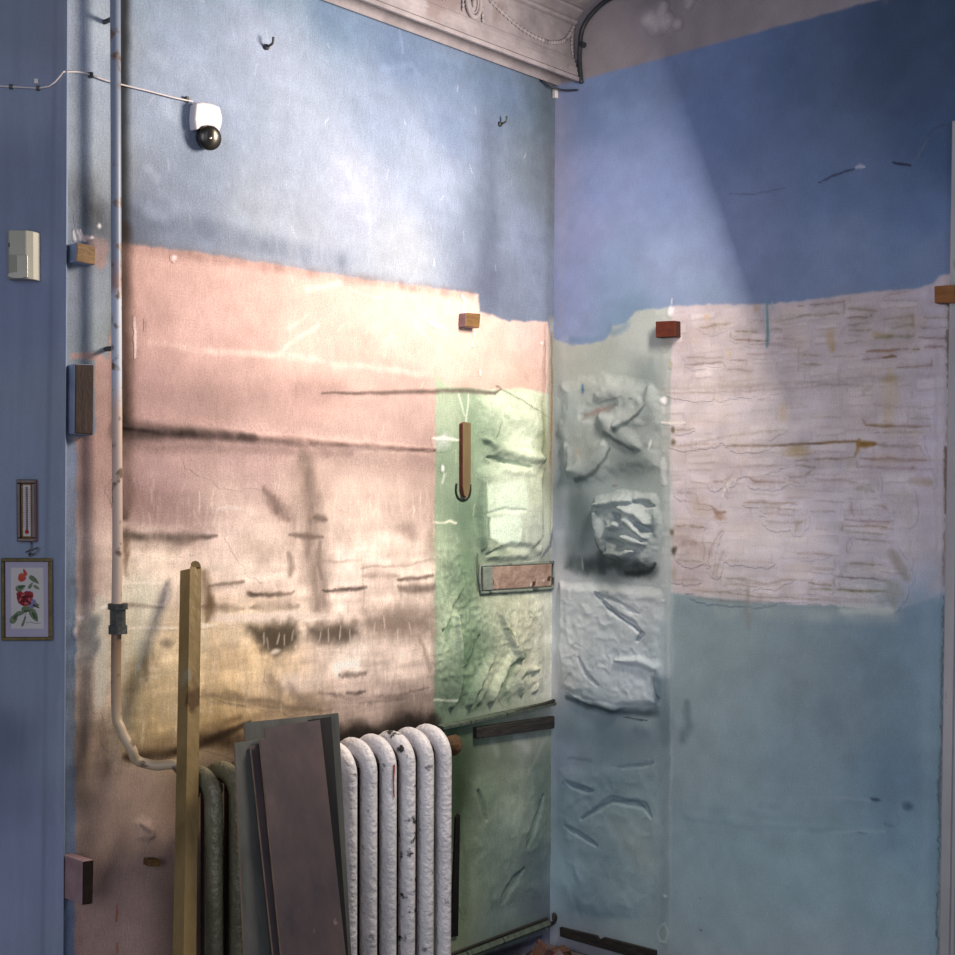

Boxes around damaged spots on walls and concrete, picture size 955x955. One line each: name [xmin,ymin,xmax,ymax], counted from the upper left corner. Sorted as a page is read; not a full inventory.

crack [817,122,951,184]
damp [111,535,179,738]
damp [110,437,187,475]
damp [213,432,460,715]
damp [452,642,496,715]
damp [498,648,528,708]
damp [541,285,949,613]
peeling [940,403,948,587]